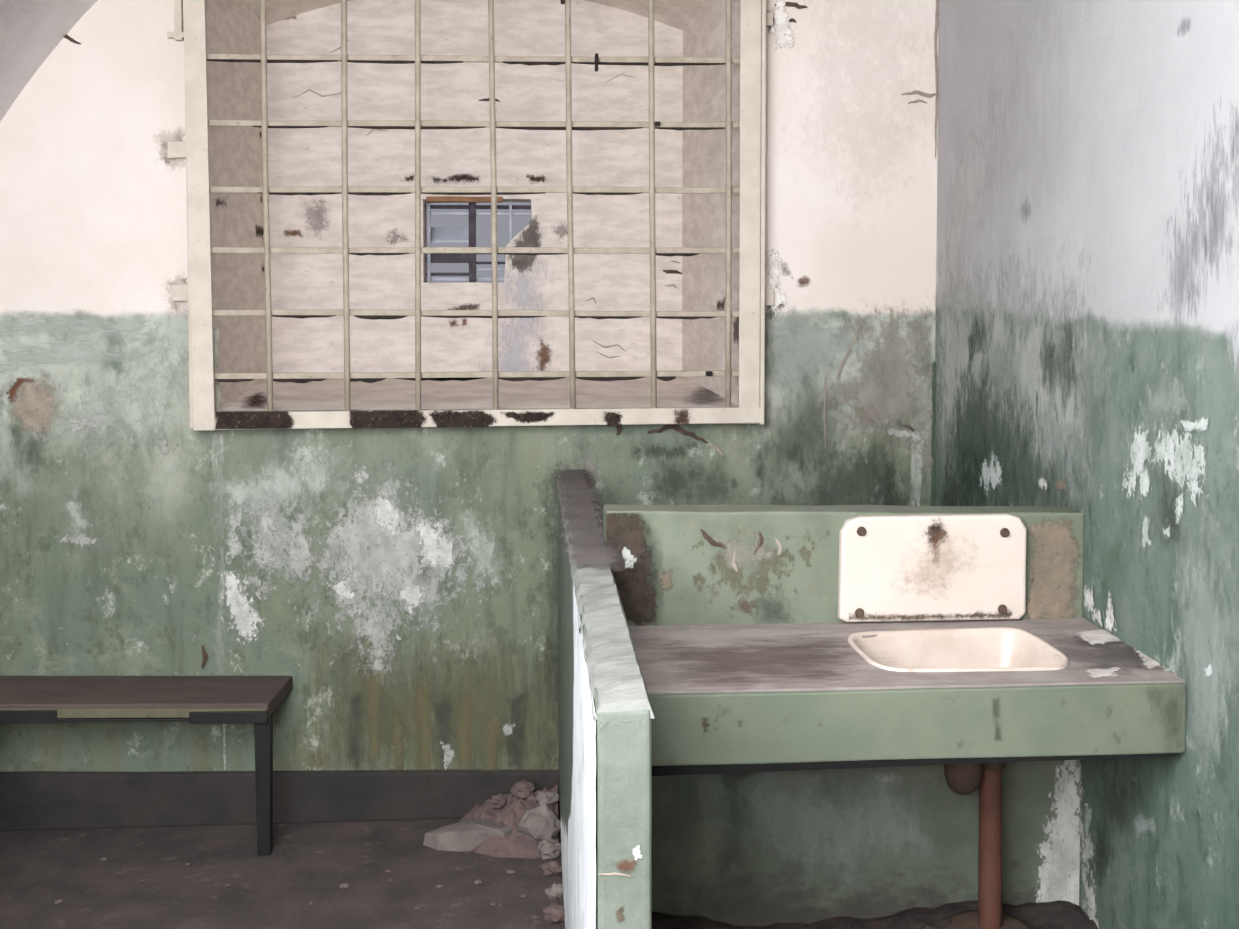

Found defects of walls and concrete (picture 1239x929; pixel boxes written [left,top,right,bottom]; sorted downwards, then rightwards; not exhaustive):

peeling [6,344,188,455]
leakage [810,448,895,505]
leakage [931,362,1064,507]
peeling [1122,381,1209,547]
peeling [210,450,497,702]
flaking render [606,512,657,626]
peeling [700,529,782,572]
peeling [1032,760,1102,929]